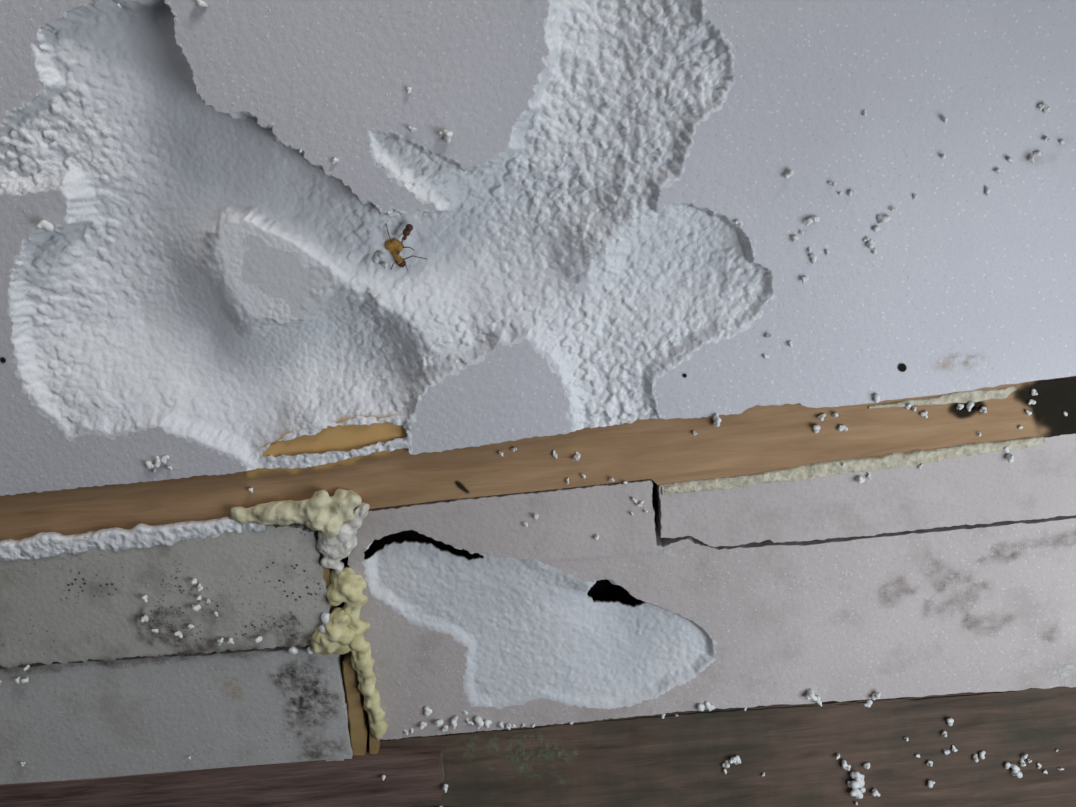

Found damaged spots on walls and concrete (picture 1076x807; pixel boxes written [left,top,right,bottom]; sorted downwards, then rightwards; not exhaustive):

spalling [0,0,777,478]